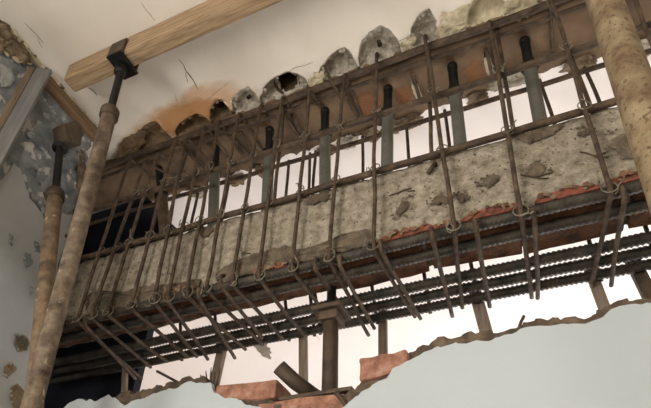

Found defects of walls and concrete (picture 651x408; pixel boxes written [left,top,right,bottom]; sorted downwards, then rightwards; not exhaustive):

flaking render [0,20,98,128]
peeling [19,113,64,216]
peeling [60,146,86,217]
spalling [80,0,617,262]
spalling [607,128,633,160]
spalling [48,170,651,386]